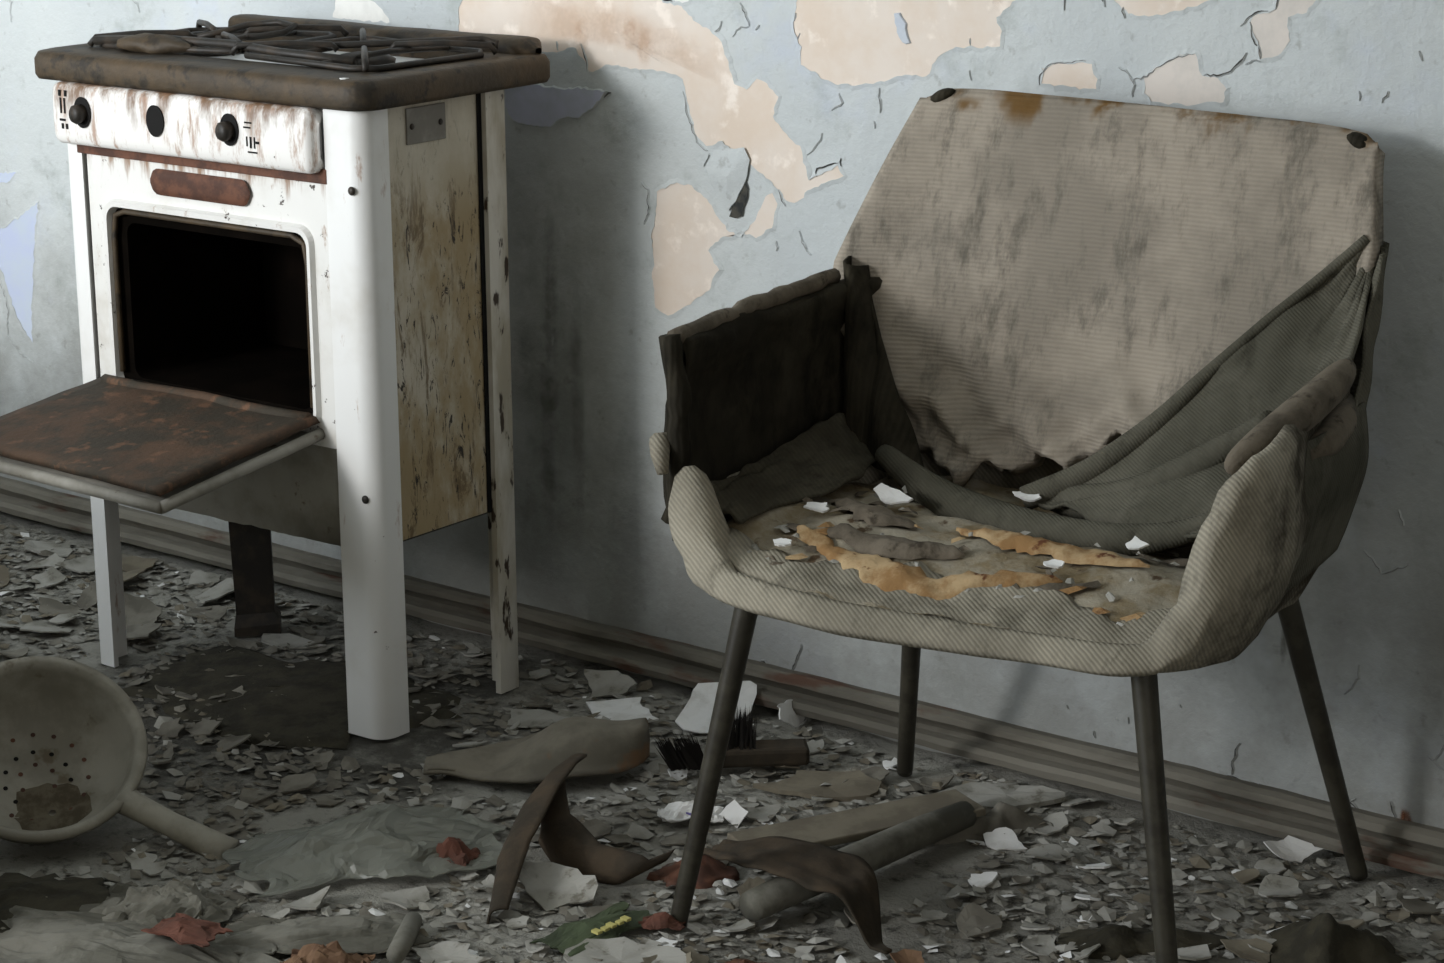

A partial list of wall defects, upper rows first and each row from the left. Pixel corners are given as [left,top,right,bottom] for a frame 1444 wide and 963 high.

peeling [331,0,392,26]
peeling [791,0,1023,91]
peeling [1039,57,1101,95]
peeling [1109,0,1218,21]
peeling [1141,48,1231,110]
peeling [1247,0,1322,63]
crack [1358,91,1390,103]
peeling [456,0,847,319]
peeling [0,201,39,343]